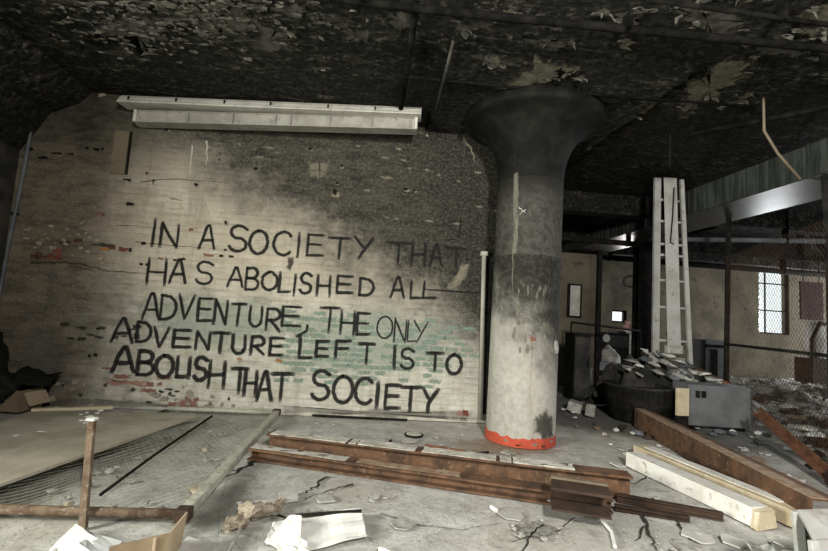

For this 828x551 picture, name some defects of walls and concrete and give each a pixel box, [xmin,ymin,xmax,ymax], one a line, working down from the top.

peeling [46,0,371,64]
peeling [387,12,421,38]
peeling [449,19,478,39]
peeling [483,55,506,70]
peeling [503,55,587,90]
peeling [617,38,636,51]
peeling [590,0,753,34]
peeling [677,3,828,118]
crack [30,261,146,274]
peeling [54,367,235,408]